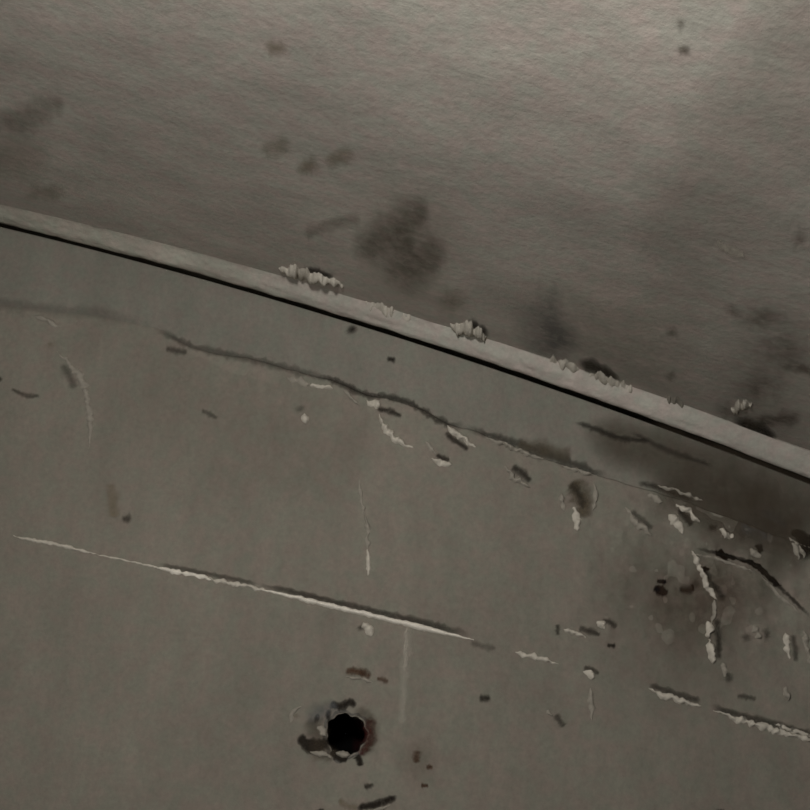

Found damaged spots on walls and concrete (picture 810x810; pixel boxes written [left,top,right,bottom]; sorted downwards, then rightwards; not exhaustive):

peeling [287,376,476,449]
crack [358,479,371,575]
spalling [559,465,599,531]
peeling [645,484,703,534]
spalling [786,529,810,560]
crack [13,535,474,671]
spalling [654,580,668,596]
crack [692,551,801,677]
crack [346,668,387,683]
crack [515,651,558,664]
peeling [783,633,791,659]
crack [649,688,810,742]